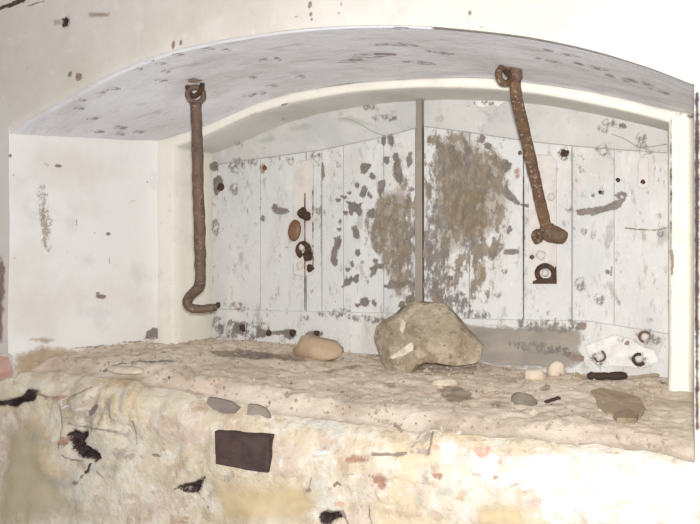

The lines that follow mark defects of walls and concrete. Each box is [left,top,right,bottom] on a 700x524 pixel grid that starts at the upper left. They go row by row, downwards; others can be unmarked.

peeling [330,134,415,309]
leakage [423,131,508,309]
peeling [212,317,297,340]
peeling [319,297,385,324]
spalling [0,387,137,485]
hole [174,477,209,508]